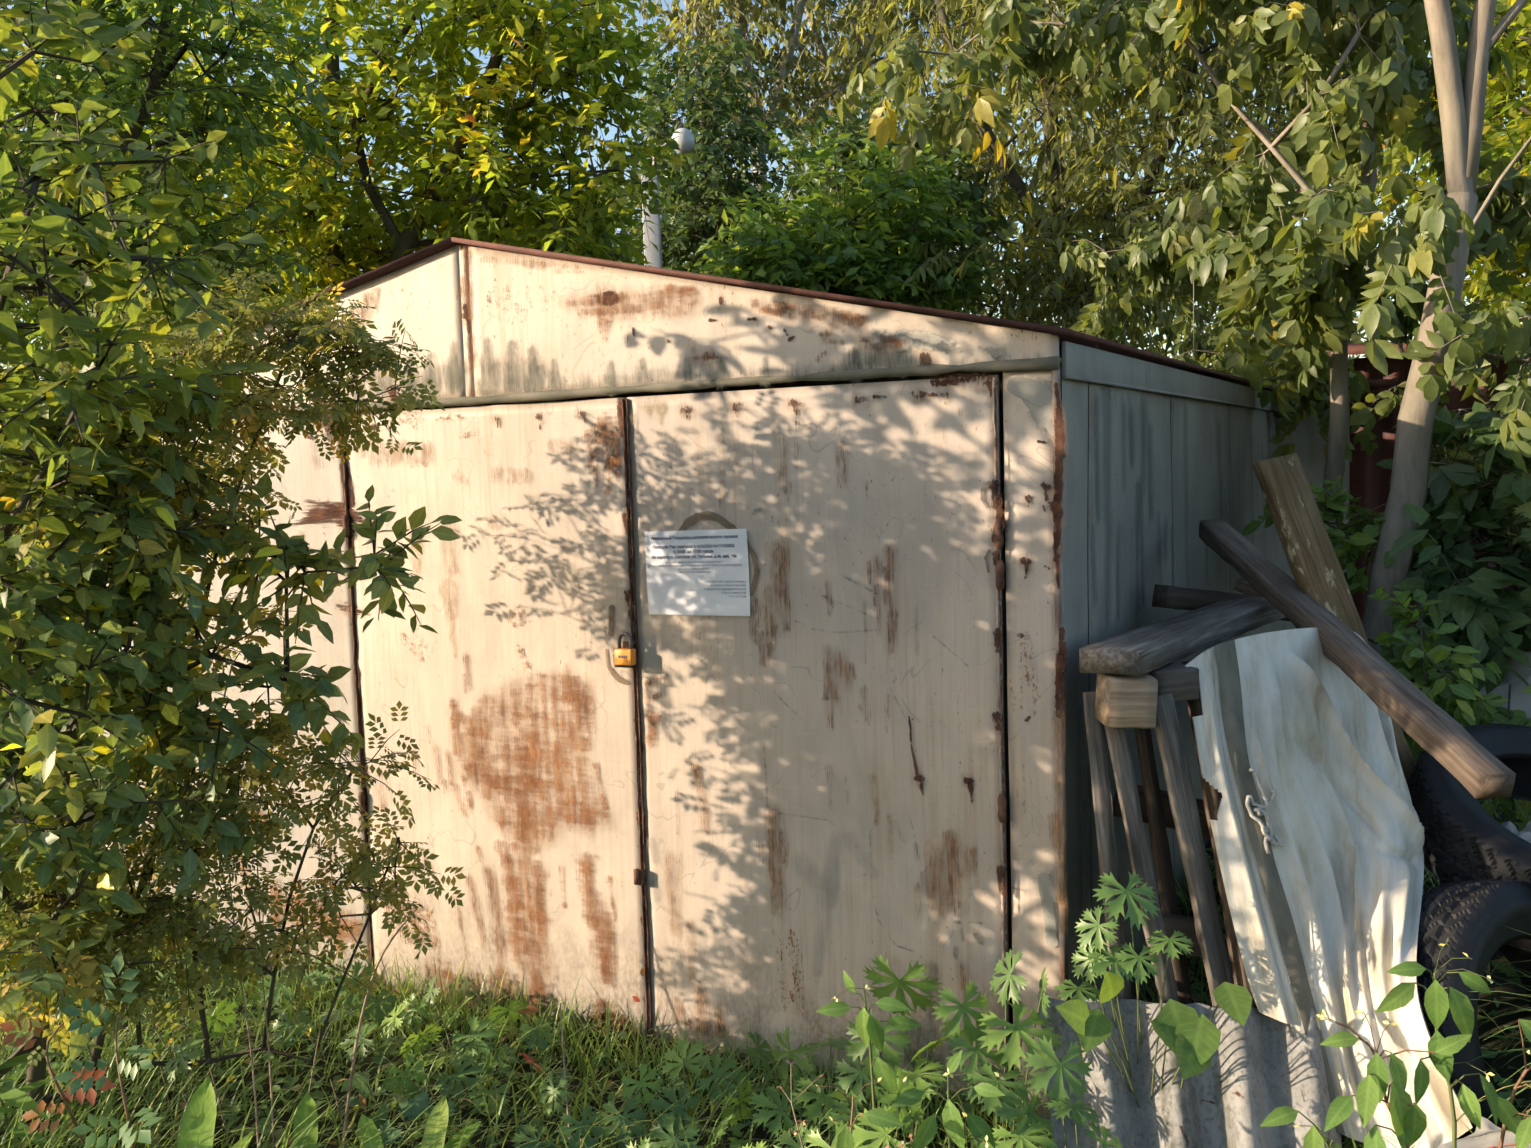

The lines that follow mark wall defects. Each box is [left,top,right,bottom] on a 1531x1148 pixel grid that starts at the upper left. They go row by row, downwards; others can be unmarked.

corrosion [460,250,554,370]
corrosion [572,284,696,327]
corrosion [753,302,864,362]
corrosion [912,352,1006,565]
corrosion [1025,481,1051,512]
corrosion [867,547,896,644]
corrosion [563,397,667,1054]
corrosion [992,590,1040,797]
corrosion [381,645,607,1002]
corrosion [996,822,1008,953]